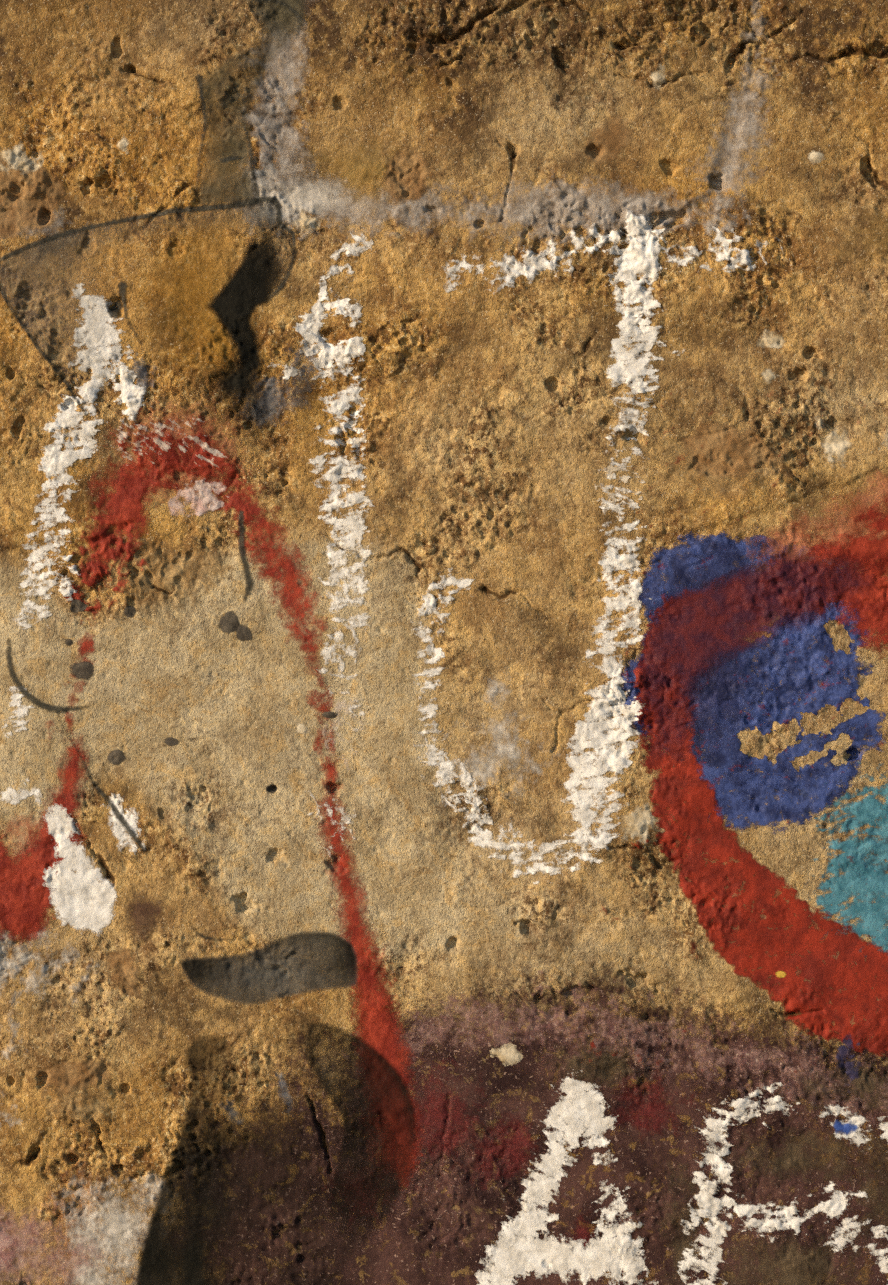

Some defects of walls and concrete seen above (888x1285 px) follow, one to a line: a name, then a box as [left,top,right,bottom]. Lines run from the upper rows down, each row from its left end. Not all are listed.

crack [410,0,584,44]
crack [616,44,685,87]
crack [735,23,791,61]
crack [809,48,888,63]